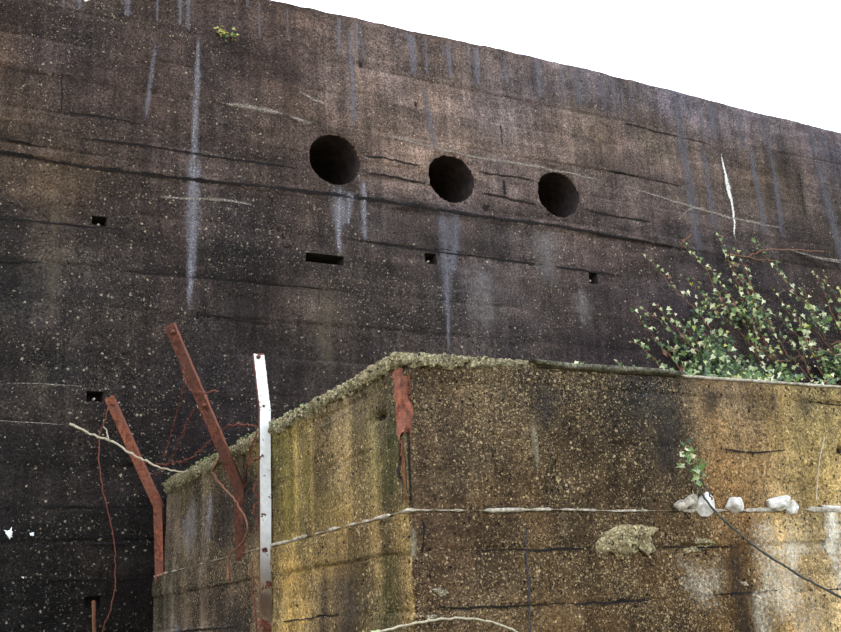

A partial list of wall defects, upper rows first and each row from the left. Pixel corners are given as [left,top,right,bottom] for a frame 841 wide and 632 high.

leakage [164,44,249,292]
leakage [335,184,366,249]
leakage [819,505,841,553]